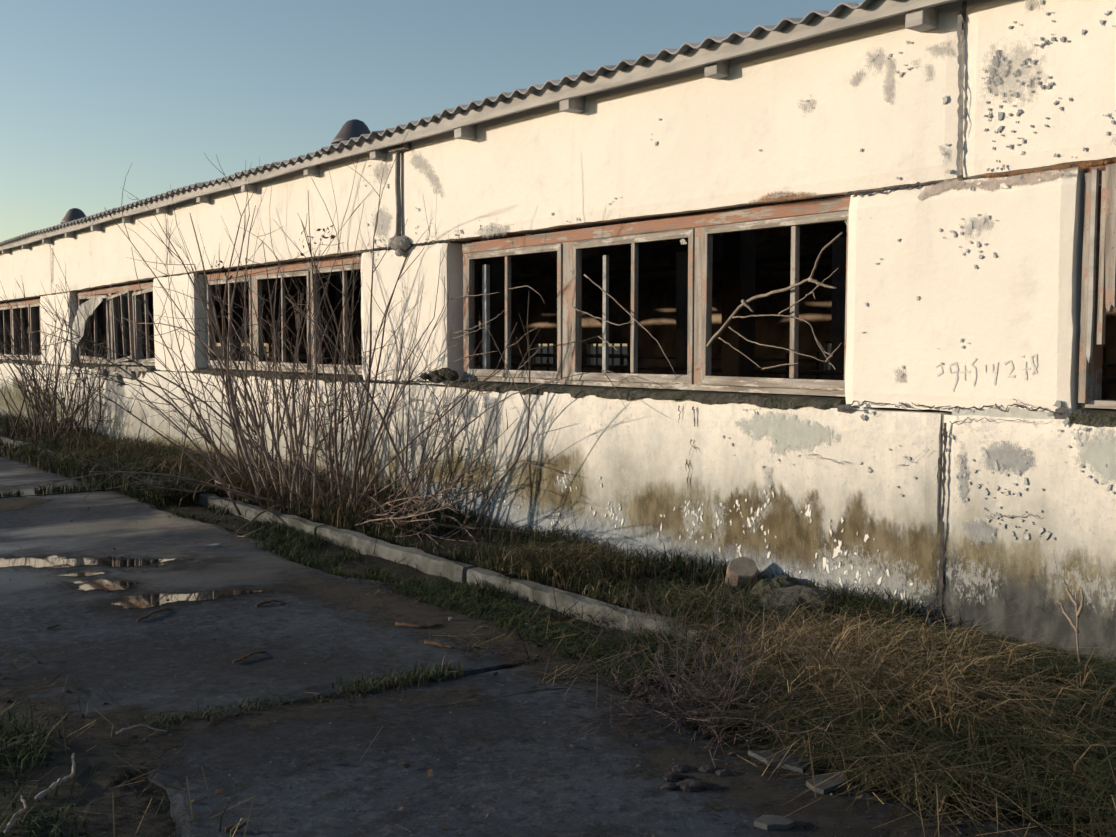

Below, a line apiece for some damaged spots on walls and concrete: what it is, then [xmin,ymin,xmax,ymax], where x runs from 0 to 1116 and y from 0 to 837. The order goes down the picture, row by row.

peeling [411,151,442,197]
peeling [850,40,951,104]
flaking render [918,0,1071,200]
water stain [364,448,1116,665]
peeling [656,409,838,562]
crack [842,399,1060,630]
peeling [942,431,1055,545]
peeling [1047,400,1116,494]